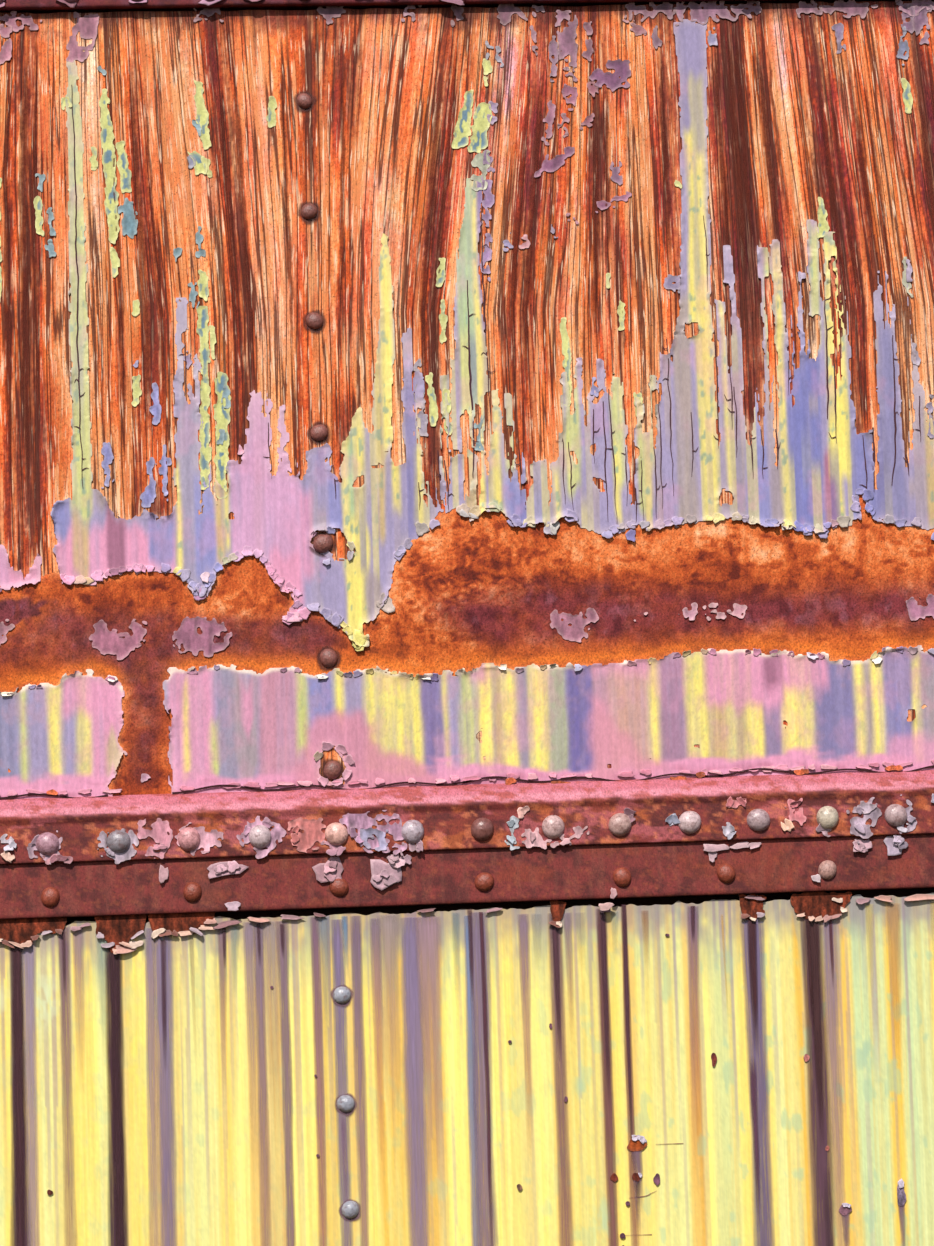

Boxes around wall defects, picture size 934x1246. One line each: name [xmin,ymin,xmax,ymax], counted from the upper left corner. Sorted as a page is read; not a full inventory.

corrosion [295,92,314,112]
corrosion [298,202,320,224]
corrosion [303,311,325,333]
peeling [0,0,934,795]
corrosion [307,422,329,444]
corrosion [311,532,335,556]
corrosion [317,647,340,670]
peeling [97,810,423,891]
peeling [505,806,589,850]
peeling [703,796,762,863]
peeling [846,795,917,856]
peeling [0,901,325,955]